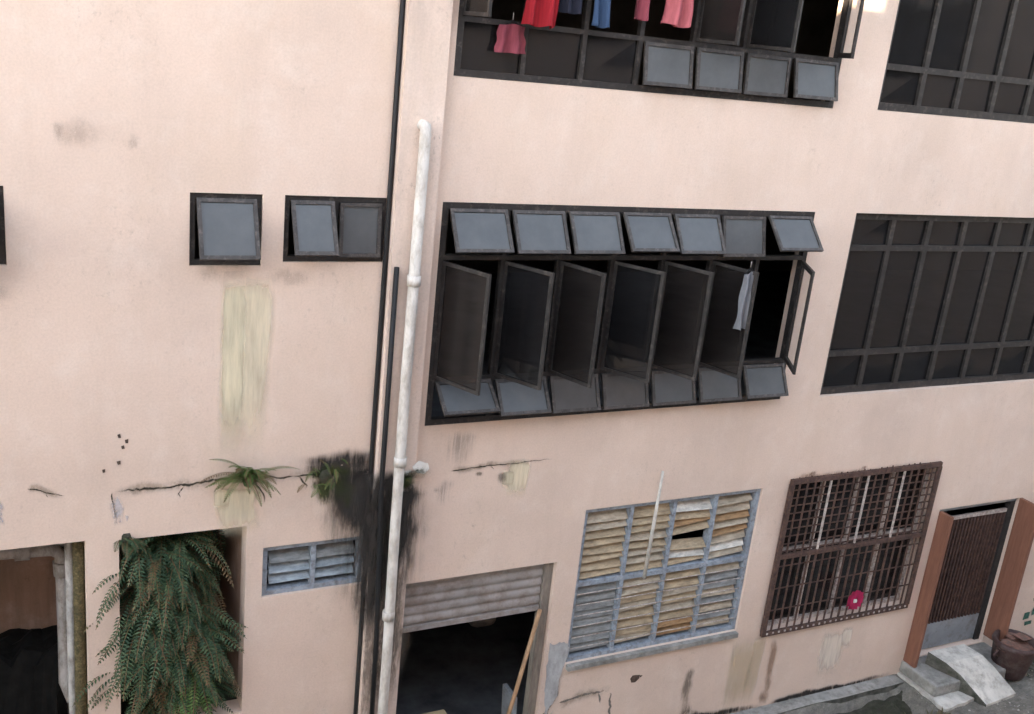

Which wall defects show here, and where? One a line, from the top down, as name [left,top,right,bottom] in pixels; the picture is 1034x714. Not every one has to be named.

damp [222,290,270,414]
crack [111,474,313,517]
damp [310,452,419,699]